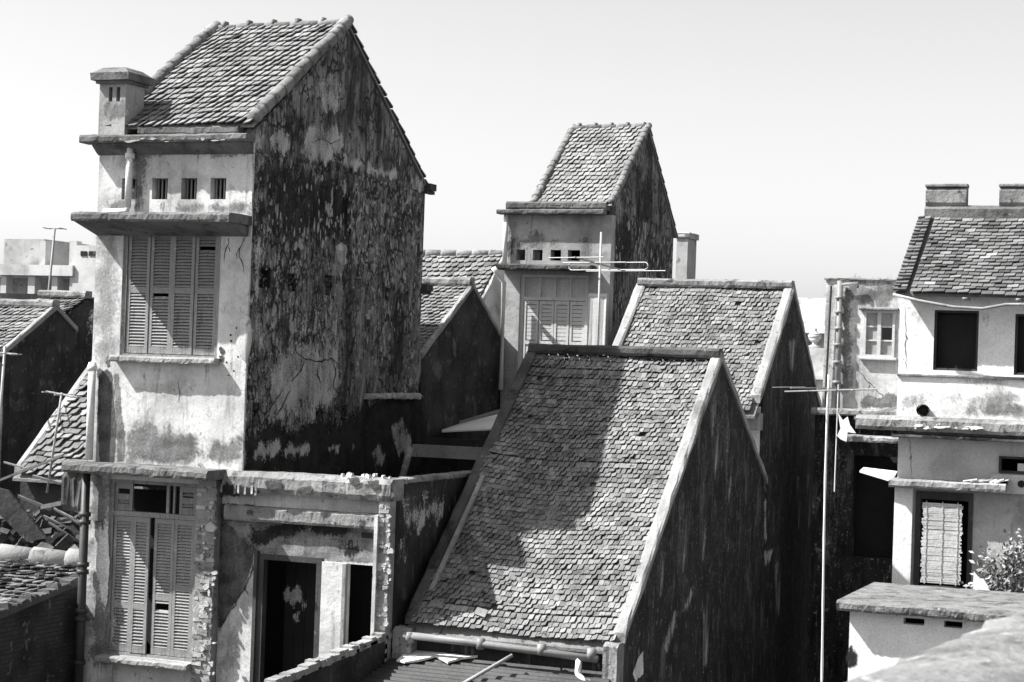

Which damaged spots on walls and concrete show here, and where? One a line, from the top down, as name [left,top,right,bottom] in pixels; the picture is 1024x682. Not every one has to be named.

water stain [126,33,427,478]
flaking render [252,71,424,463]
crack [265,349,342,416]
water stain [966,379,1024,418]
spalling [200,441,446,630]